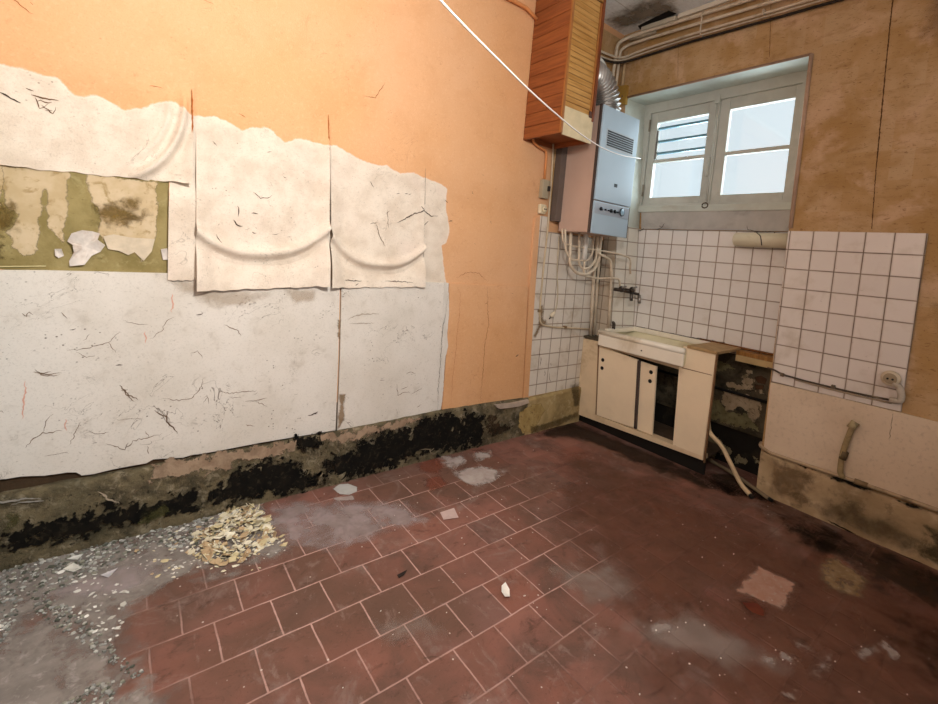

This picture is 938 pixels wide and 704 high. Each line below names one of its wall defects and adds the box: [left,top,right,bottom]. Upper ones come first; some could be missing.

leakage [611,0,675,27]
flaking render [0,90,196,273]
peeling [212,247,315,265]
peeling [328,115,455,410]
peeling [721,370,764,423]
spalling [310,405,421,444]
spalling [0,437,297,492]
leakage [0,408,512,553]
leakage [773,463,809,503]
leakage [831,476,870,490]
leakage [824,504,938,562]
leakage [60,567,141,593]